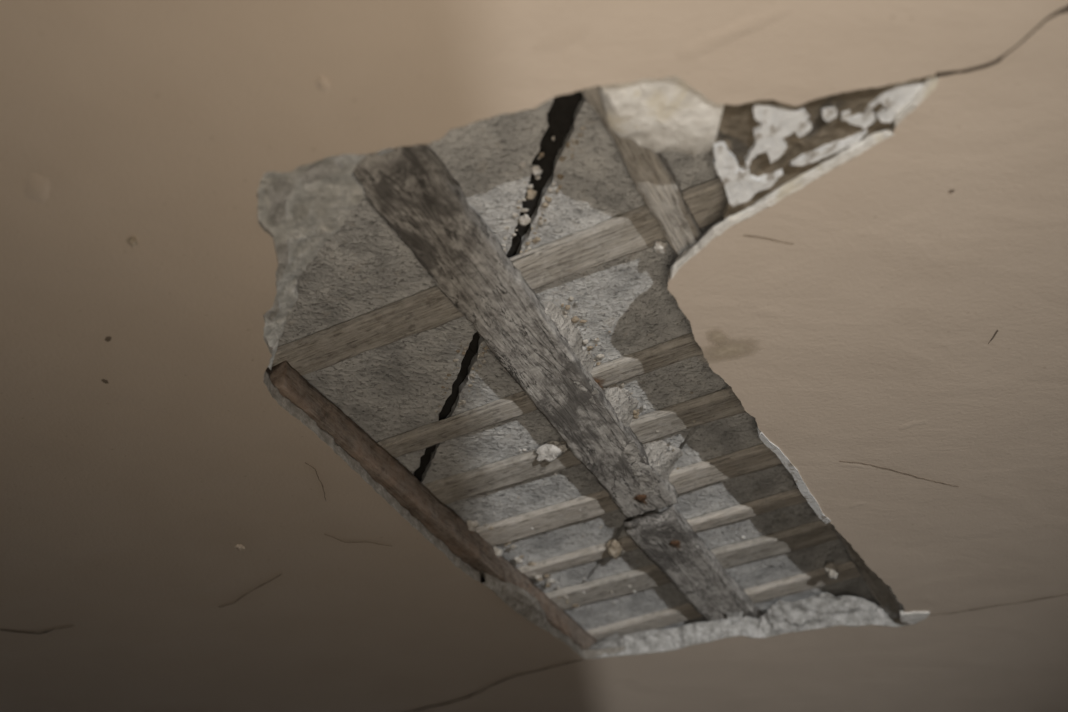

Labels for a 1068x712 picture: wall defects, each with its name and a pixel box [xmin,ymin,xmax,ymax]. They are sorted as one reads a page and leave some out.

crack [936,6,1068,77]
flaking render [600,75,939,280]
flaking render [257,148,395,370]
flaking render [757,428,831,524]
crack [838,461,959,487]
flaking render [589,592,930,658]